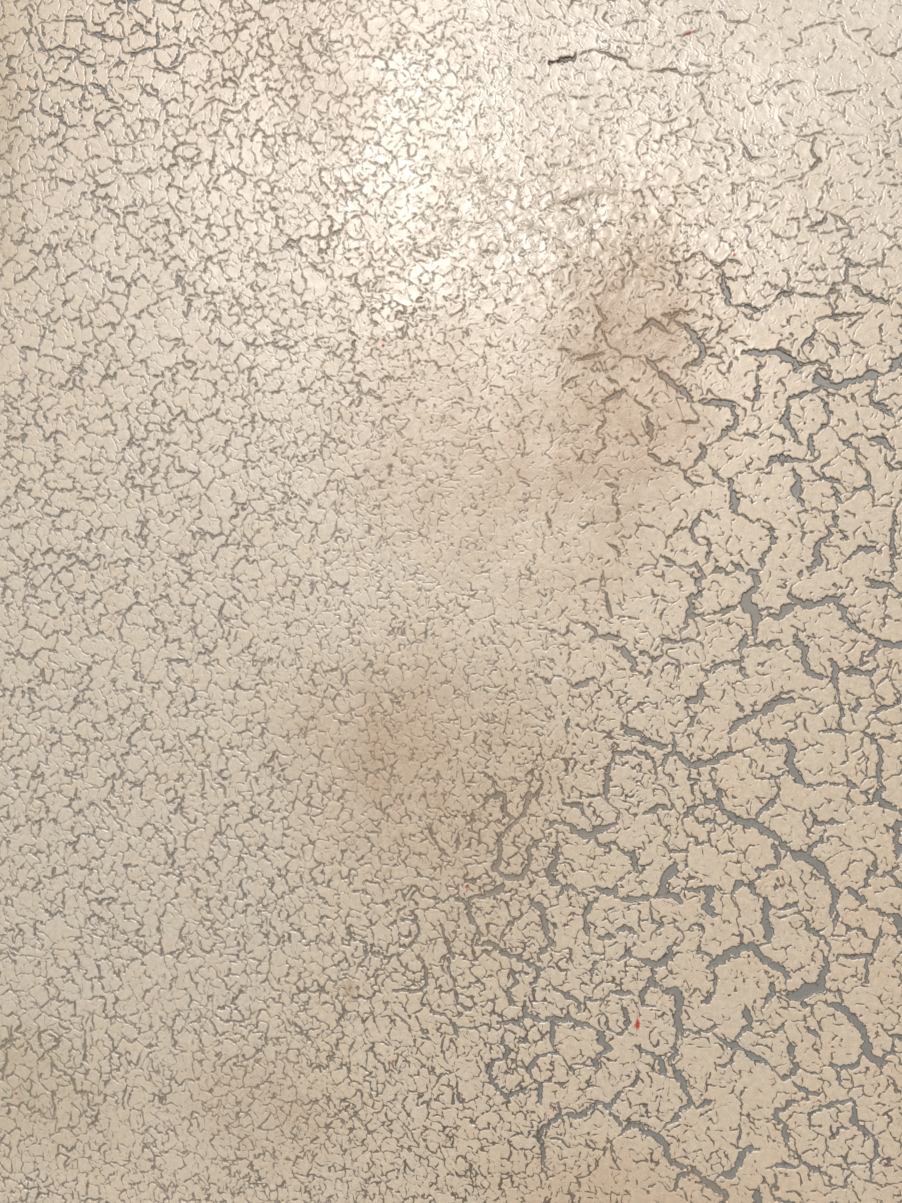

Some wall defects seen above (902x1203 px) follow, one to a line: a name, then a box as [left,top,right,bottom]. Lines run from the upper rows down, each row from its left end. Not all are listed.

crack [779,0,892,54]
crack [708,258,744,270]
crack [719,268,735,307]
crack [730,265,796,314]
crack [801,442,872,478]
crack [827,424,866,450]
crack [864,433,902,481]
crack [788,462,882,526]
crack [688,513,714,568]
crack [682,673,711,718]
crack [816,697,859,736]
crack [826,1138,881,1186]